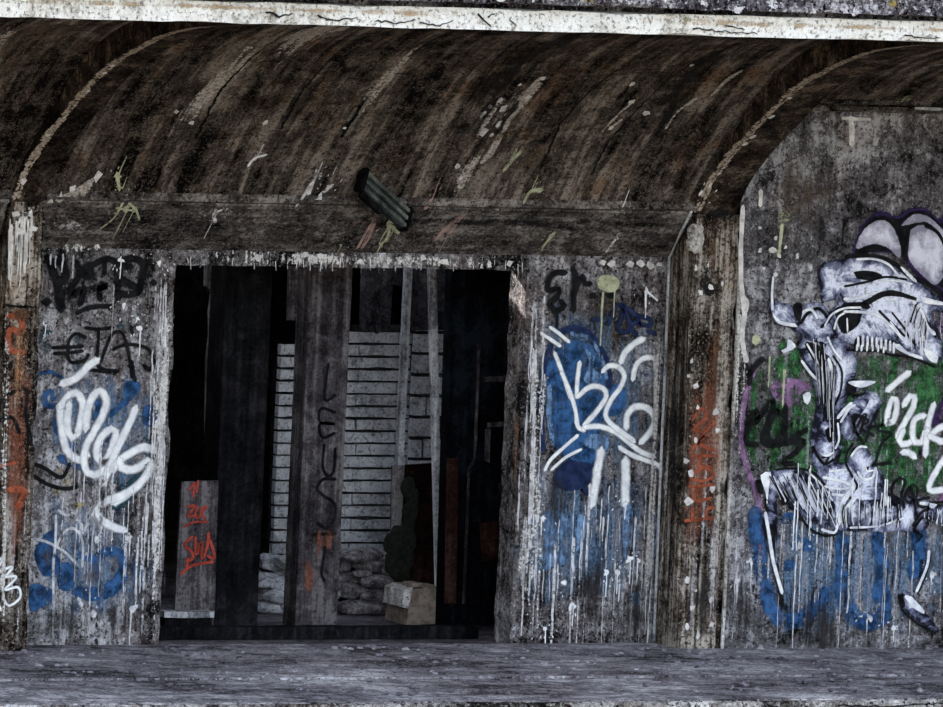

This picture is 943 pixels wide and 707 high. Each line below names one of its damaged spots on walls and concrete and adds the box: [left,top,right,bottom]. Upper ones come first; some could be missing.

peeling [8,208,38,286]
leakage [841,116,871,147]
peeling [0,341,9,621]
leakage [662,284,686,605]